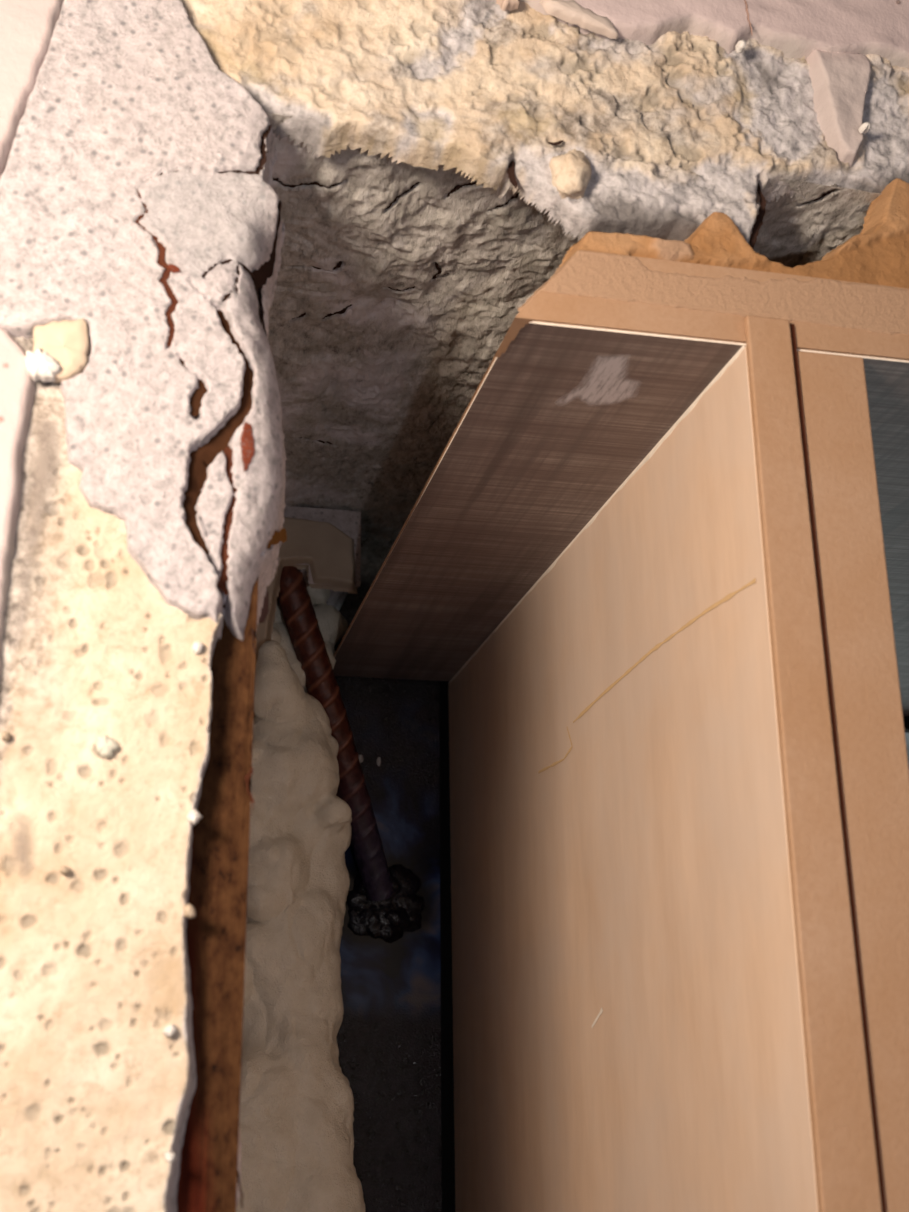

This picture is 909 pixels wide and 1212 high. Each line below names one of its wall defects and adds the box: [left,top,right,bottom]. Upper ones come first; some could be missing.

crack [744,0,753,35]
flaking render [180,0,909,243]
crack [384,182,420,210]
crack [447,160,521,209]
crack [749,183,766,249]
crack [803,189,836,204]
crack [388,262,449,291]
crack [135,125,352,596]
flaking render [0,0,286,1212]